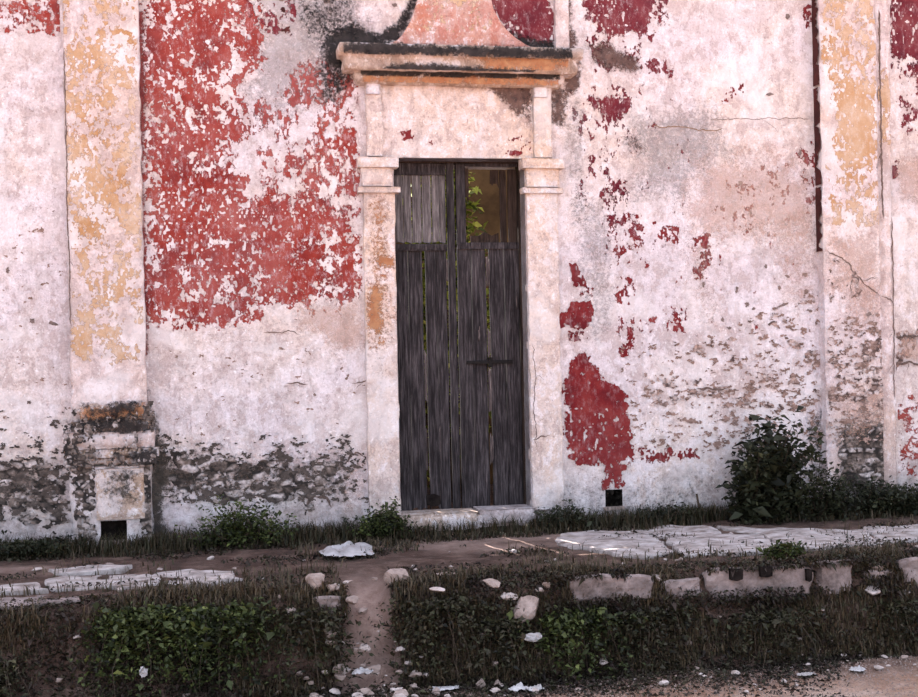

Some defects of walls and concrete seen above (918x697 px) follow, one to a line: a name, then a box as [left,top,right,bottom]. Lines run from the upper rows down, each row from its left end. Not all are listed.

peeling [0,0,363,365]
water stain [299,0,581,126]
water stain [589,41,641,73]
peeling [572,84,679,305]
peeling [581,0,674,78]
crack [653,117,803,133]
peeling [713,0,918,235]
crack [829,10,918,399]
peeling [559,263,594,342]
water stain [65,390,153,435]
flaking render [0,401,369,551]
peeling [561,289,884,511]